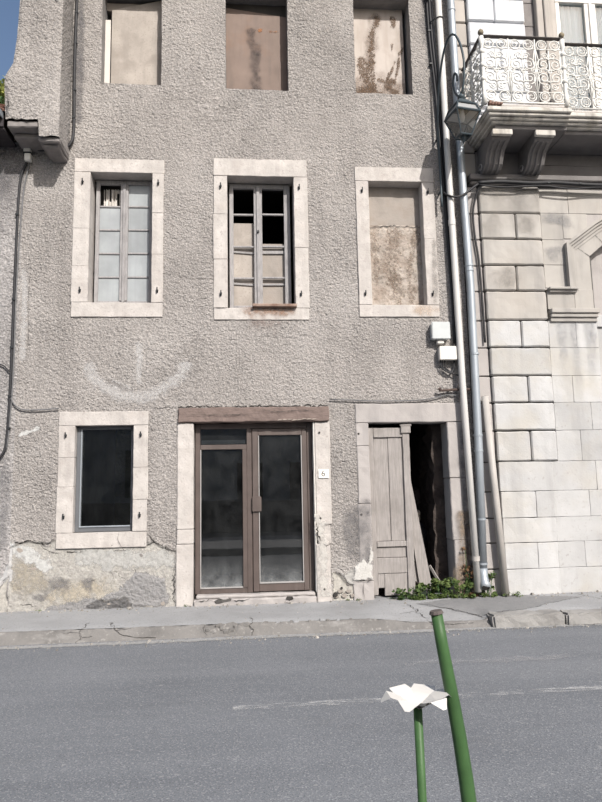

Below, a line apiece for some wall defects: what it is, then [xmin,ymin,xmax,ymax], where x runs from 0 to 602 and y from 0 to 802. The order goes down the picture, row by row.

flaking render [0,540,176,613]